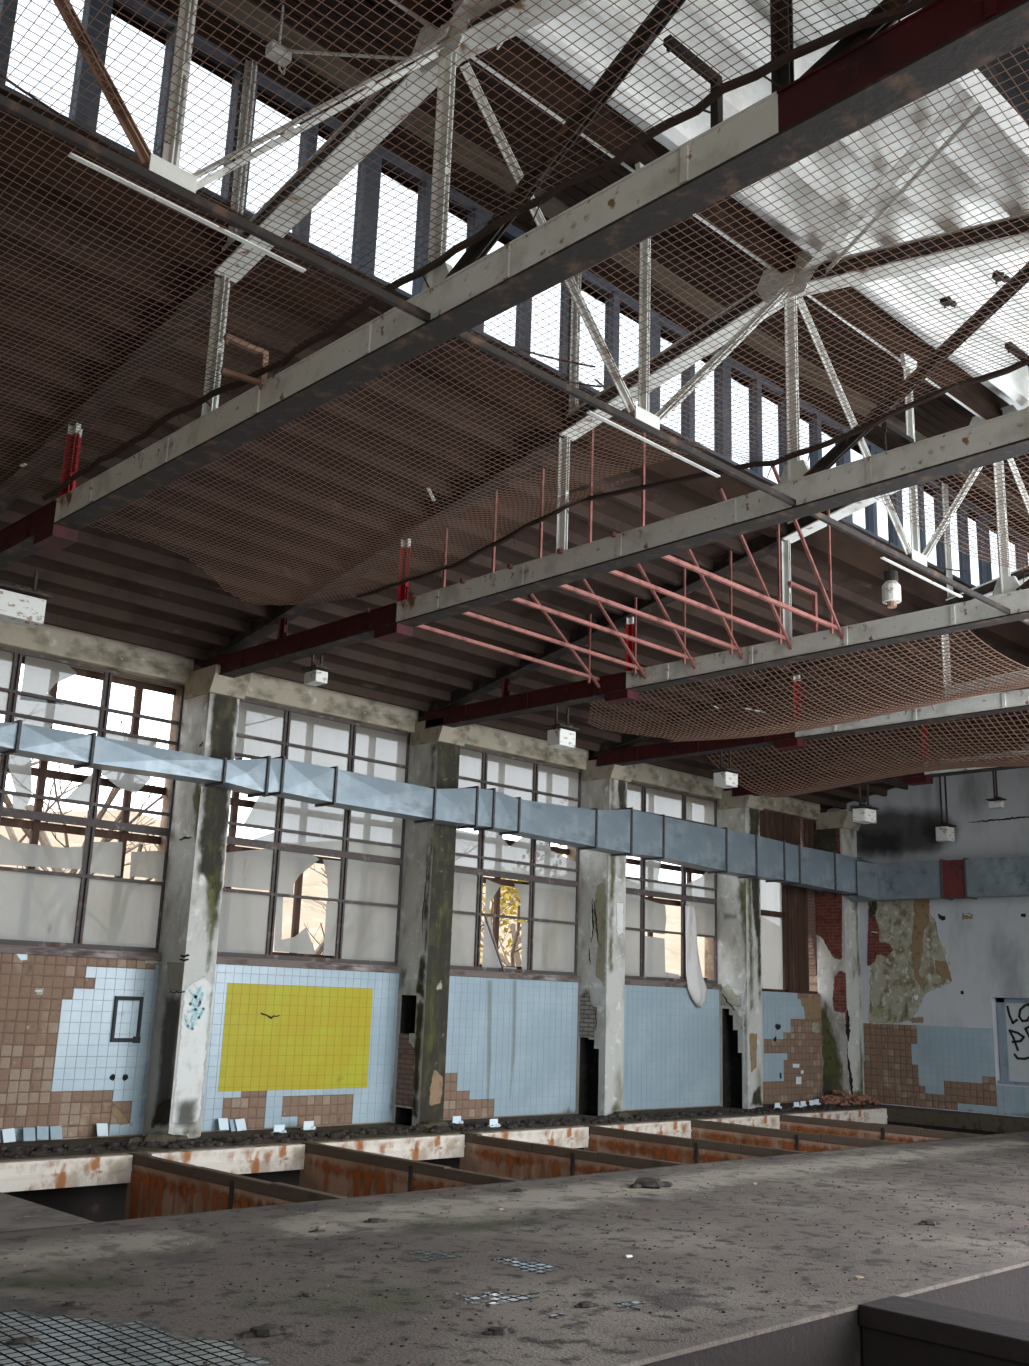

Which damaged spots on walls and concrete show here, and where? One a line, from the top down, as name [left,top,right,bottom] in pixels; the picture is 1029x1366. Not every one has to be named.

leakage [208,693,237,760]
flaking render [800,818,841,854]
leakage [193,784,228,957]
peeling [0,953,160,1138]
flaking render [720,984,745,1078]
flaking render [763,888,1000,1135]
peeling [222,1091,353,1133]
peeling [443,1073,501,1127]
rust [476,1115,856,1178]
rust [129,1171,274,1219]
rust [316,1162,393,1197]